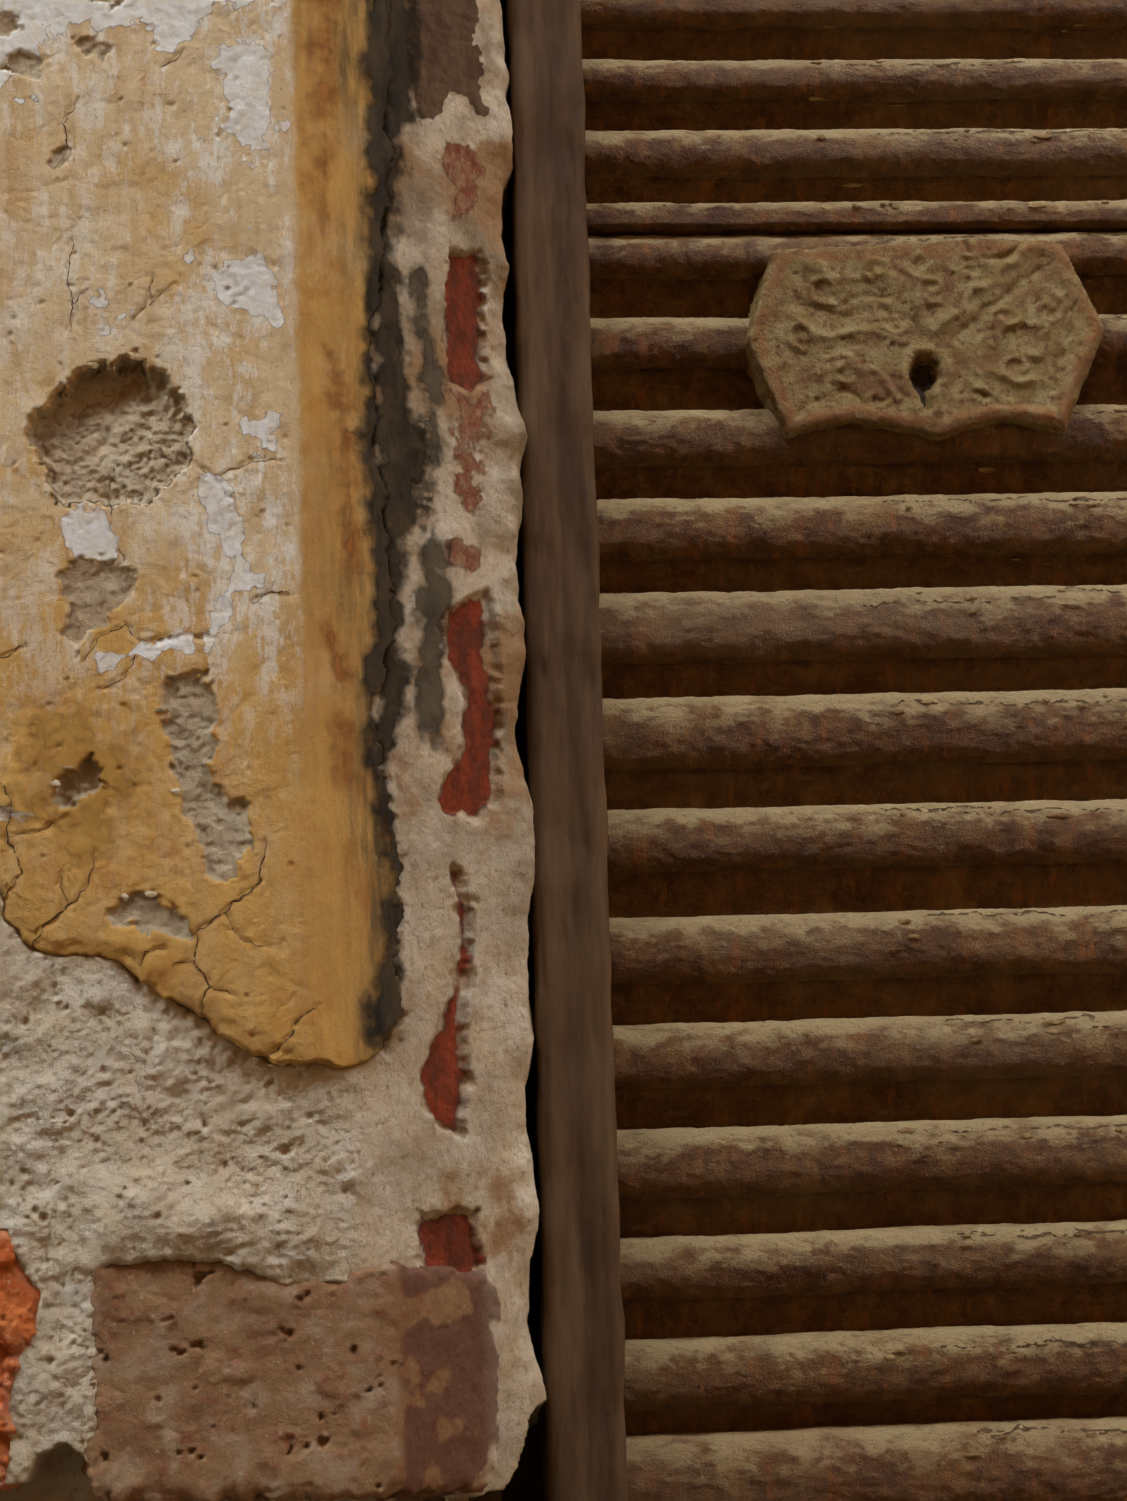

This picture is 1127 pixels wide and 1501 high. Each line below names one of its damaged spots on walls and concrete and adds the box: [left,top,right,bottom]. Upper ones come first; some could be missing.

spalling [442,142,486,220]
peeling [239,411,281,458]
leakage [370,0,452,799]
spalling [444,253,496,512]
flaking render [26,353,266,881]
spalling [444,537,481,571]
spalling [438,598,500,816]
flaking render [106,891,193,941]
leakage [392,959,405,981]
spalling [420,871,473,1131]